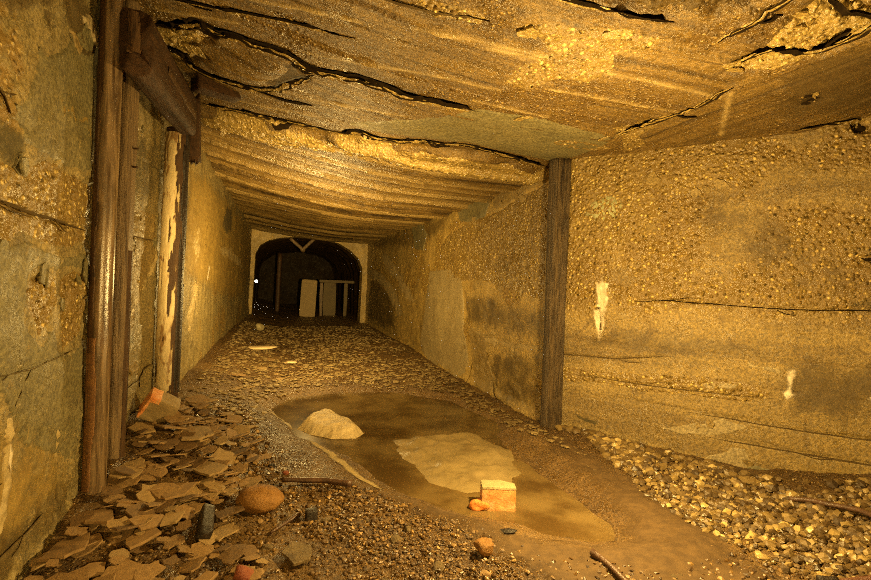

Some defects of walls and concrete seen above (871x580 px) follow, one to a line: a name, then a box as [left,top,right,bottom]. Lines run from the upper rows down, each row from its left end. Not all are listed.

crack [556,0,674,25]
crack [155,0,547,168]
crack [614,0,871,137]
damp [594,281,608,338]
damp [784,370,871,406]